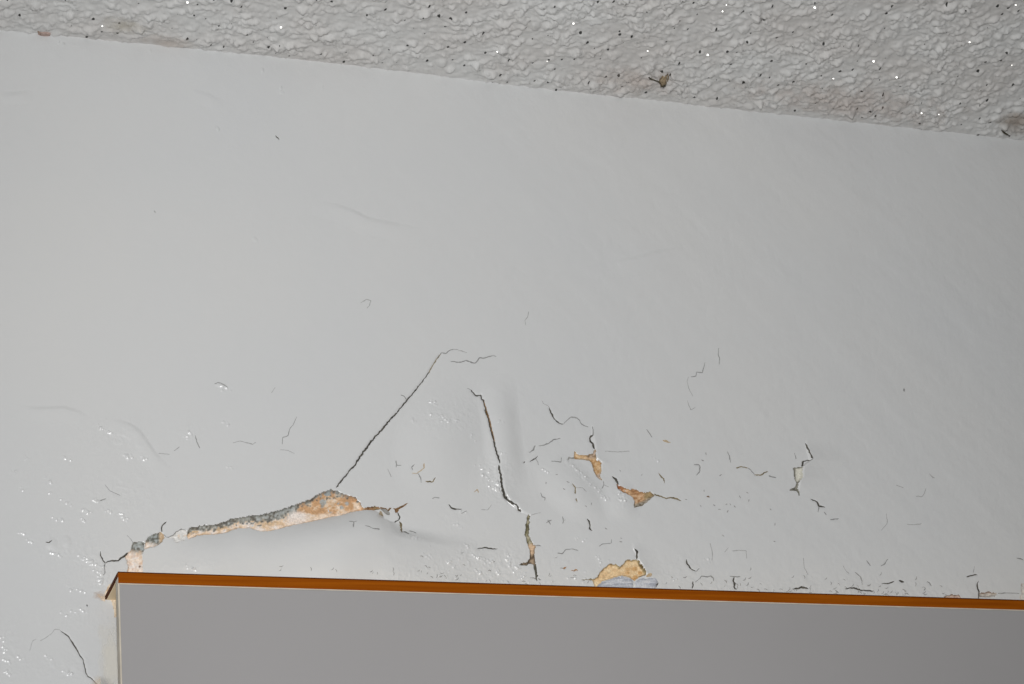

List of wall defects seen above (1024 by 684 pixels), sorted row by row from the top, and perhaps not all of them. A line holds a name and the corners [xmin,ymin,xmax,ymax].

crack [336,349,496,487]
crack [350,388,638,580]
spalling [574,450,602,480]
spalling [617,484,655,508]
spalling [125,489,399,572]
spalling [588,560,687,588]
crack [30,629,97,684]